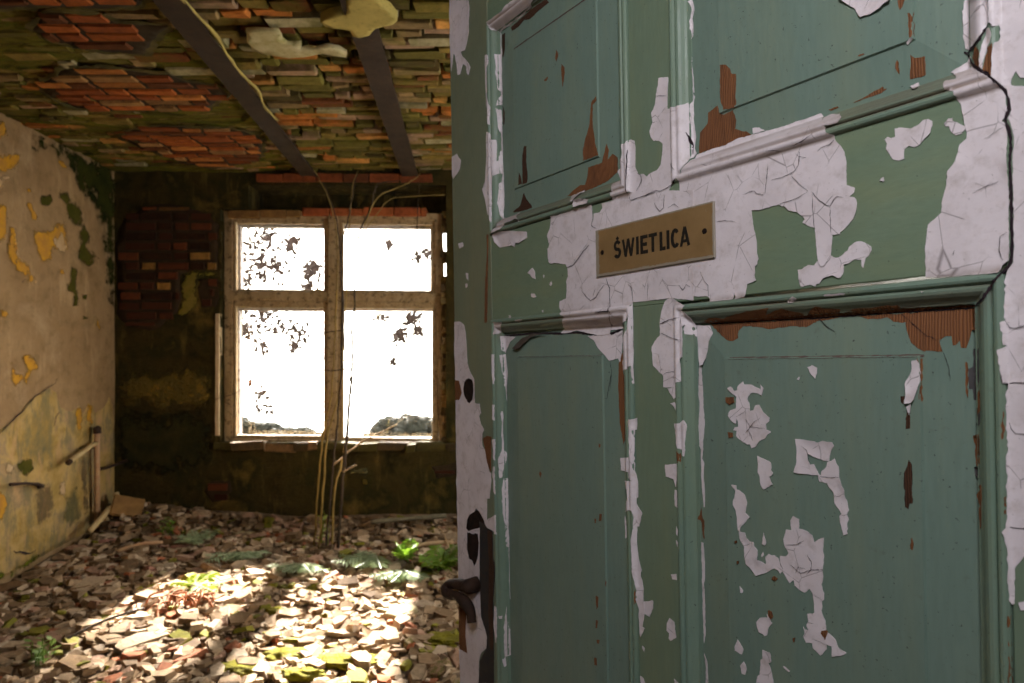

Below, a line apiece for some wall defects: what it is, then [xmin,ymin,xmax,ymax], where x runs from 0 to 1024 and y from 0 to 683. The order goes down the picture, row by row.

spalling [0,0,268,169]
flaking render [246,27,347,58]
flaking render [320,0,397,38]
peeling [842,0,926,89]
crack [0,380,57,433]
peeling [26,188,68,262]
spalling [114,199,224,331]
peeling [452,154,461,178]
peeling [454,0,549,683]
peeling [547,61,982,683]
crack [712,23,1014,376]
peeling [885,0,1024,628]